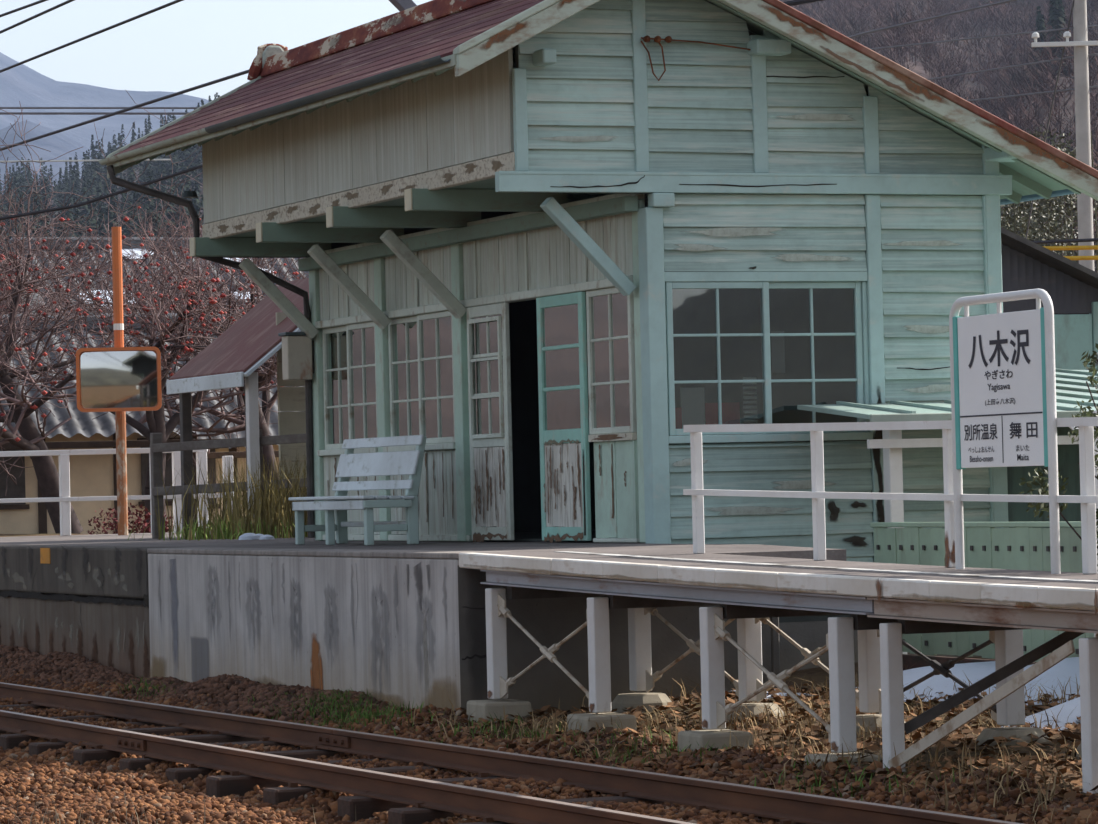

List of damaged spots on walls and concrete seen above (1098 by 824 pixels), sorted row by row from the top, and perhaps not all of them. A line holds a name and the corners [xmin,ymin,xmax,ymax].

rust [484,23,526,49]
rust [762,6,944,102]
rust [982,122,1088,178]
peeling [266,193,358,221]
crack [550,175,645,188]
crack [679,181,837,189]
peeling [475,449,504,524]
peeling [544,445,580,523]
leakage [170,559,178,660]
leakage [407,564,430,602]
leakage [191,638,208,682]
rust [310,637,323,690]